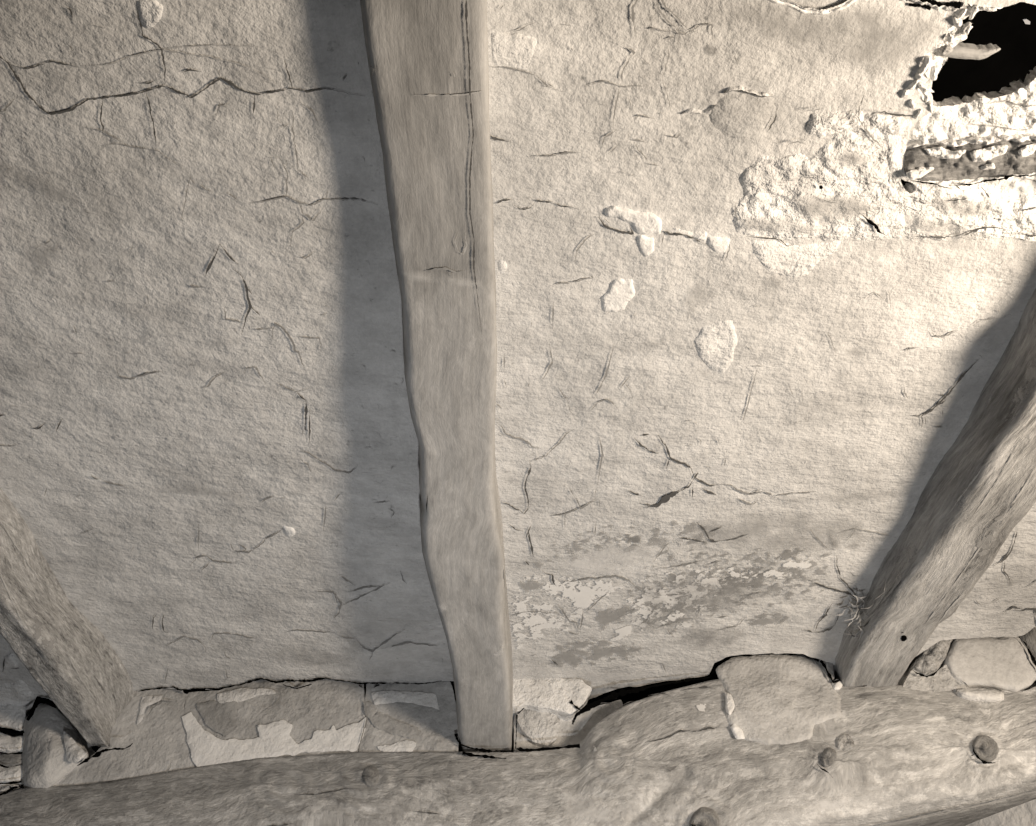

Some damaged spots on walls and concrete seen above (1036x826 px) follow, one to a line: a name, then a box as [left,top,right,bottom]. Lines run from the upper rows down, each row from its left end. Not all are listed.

crack [900,0,961,12]
crack [0,2,377,259]
crack [492,0,804,177]
crack [846,92,919,149]
spalling [888,4,1036,242]
crack [662,203,791,264]
crack [190,244,358,530]
crack [496,199,654,635]
crack [629,416,818,508]
peeling [513,557,812,649]
peeling [182,712,366,767]
peeling [377,740,416,752]